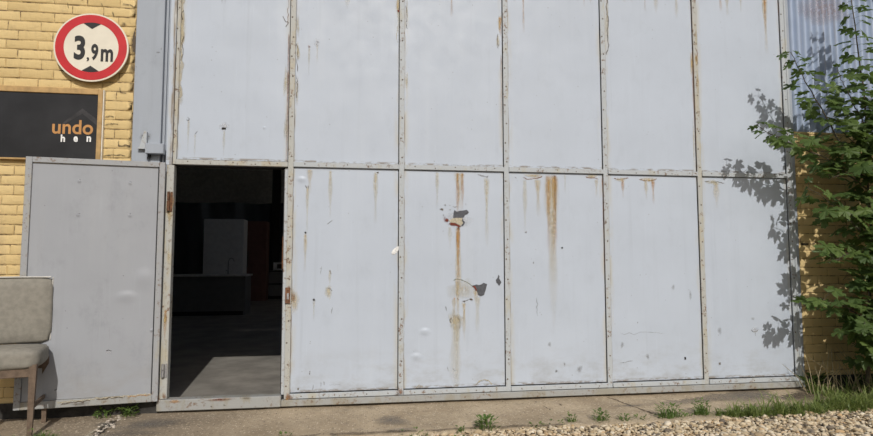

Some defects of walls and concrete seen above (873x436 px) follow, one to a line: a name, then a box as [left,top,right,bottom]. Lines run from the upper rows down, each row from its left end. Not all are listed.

peeling [441,204,469,227]
peeling [472,275,501,296]